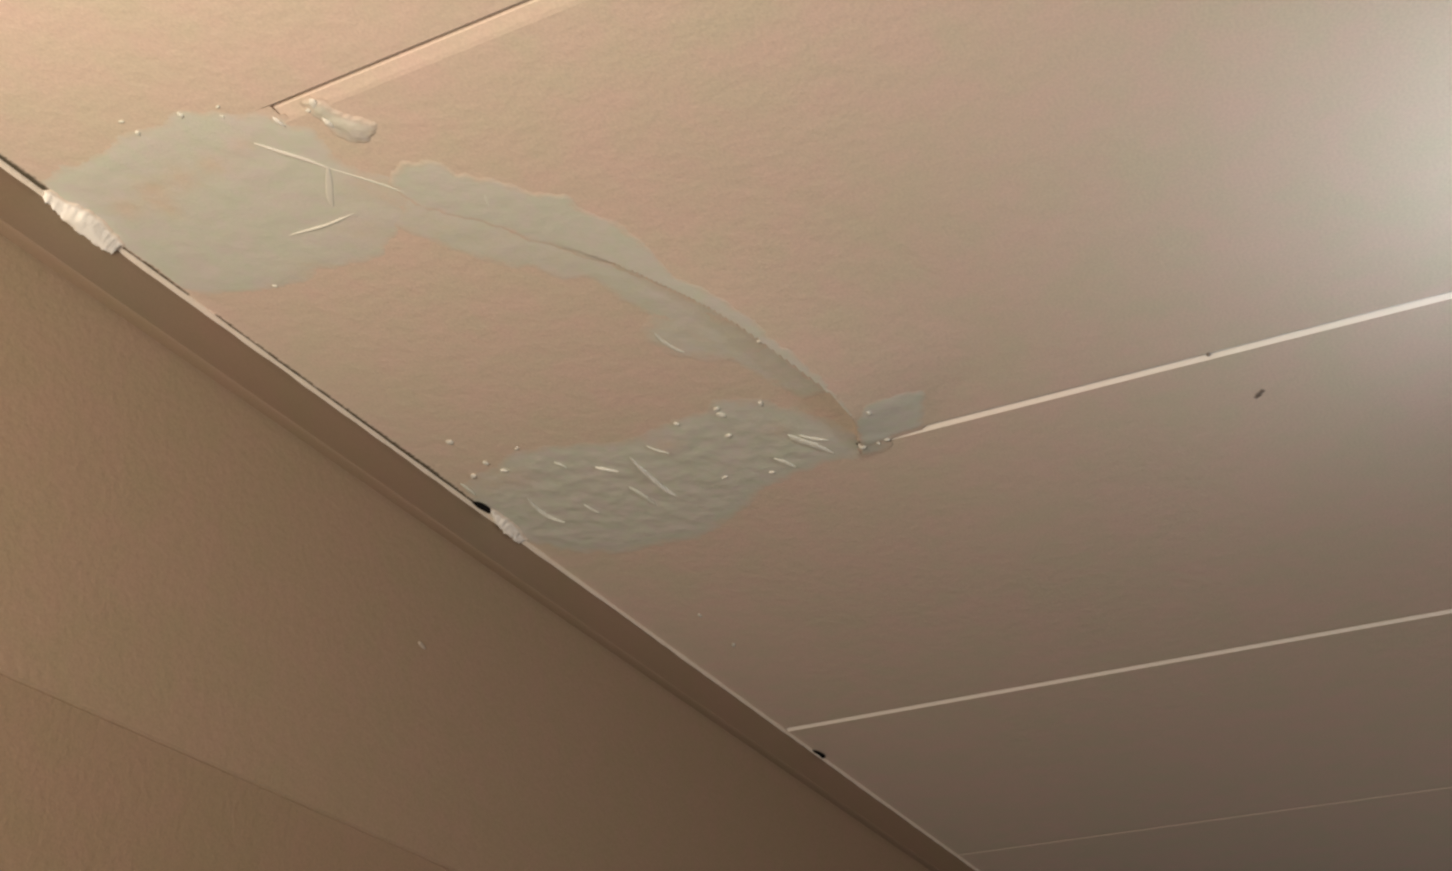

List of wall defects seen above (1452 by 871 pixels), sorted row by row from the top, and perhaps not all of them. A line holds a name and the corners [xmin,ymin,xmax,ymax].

peeling [299,96,379,143]